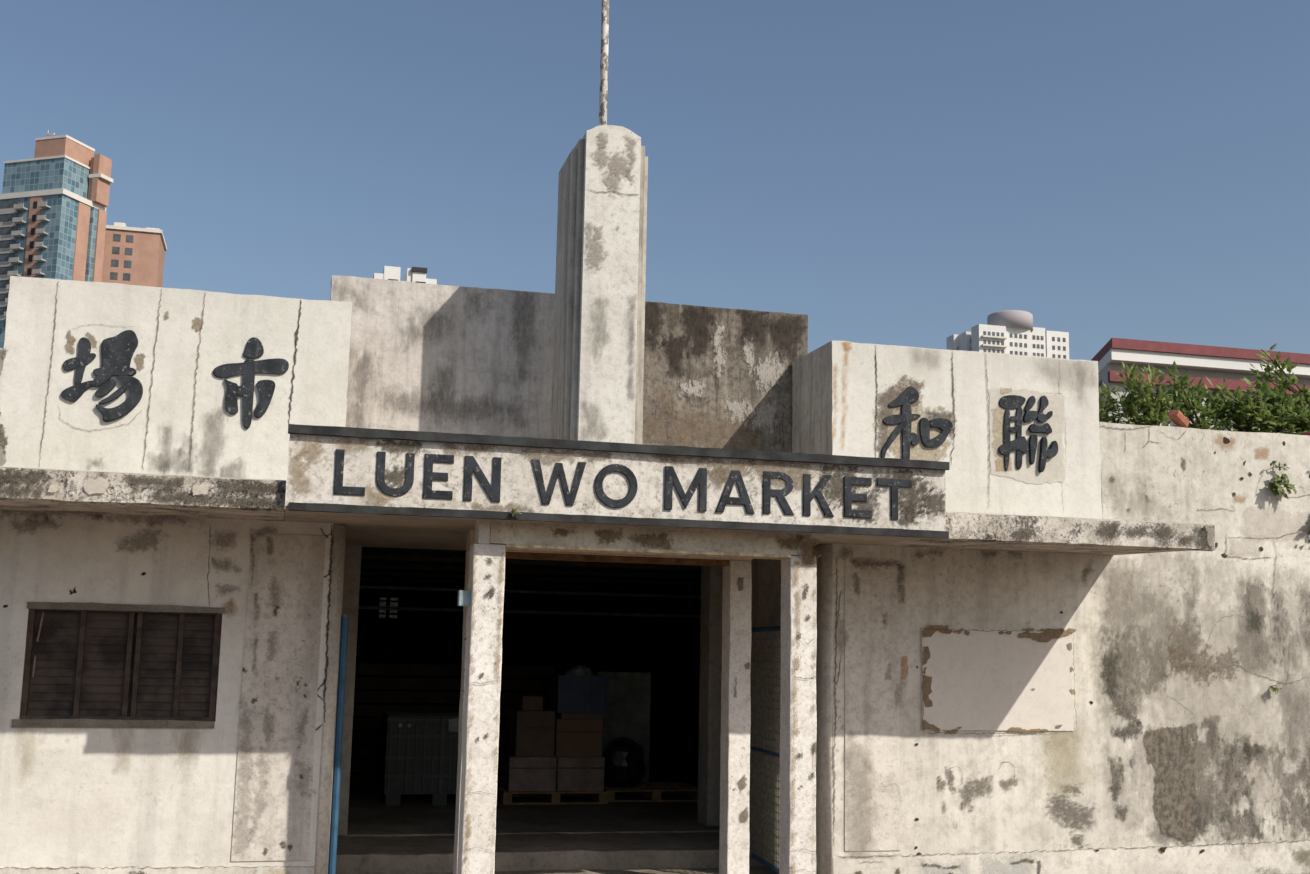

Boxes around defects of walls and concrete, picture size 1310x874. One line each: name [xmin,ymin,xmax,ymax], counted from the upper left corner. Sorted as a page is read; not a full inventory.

water stain [630,302,806,436]
peeling [873,375,958,461]
peeling [83,477,110,495]
peeling [192,484,210,495]
peeling [998,611,1076,650]
peeling [902,625,970,733]
peeling [1009,725,1062,733]
water stain [1100,574,1310,874]